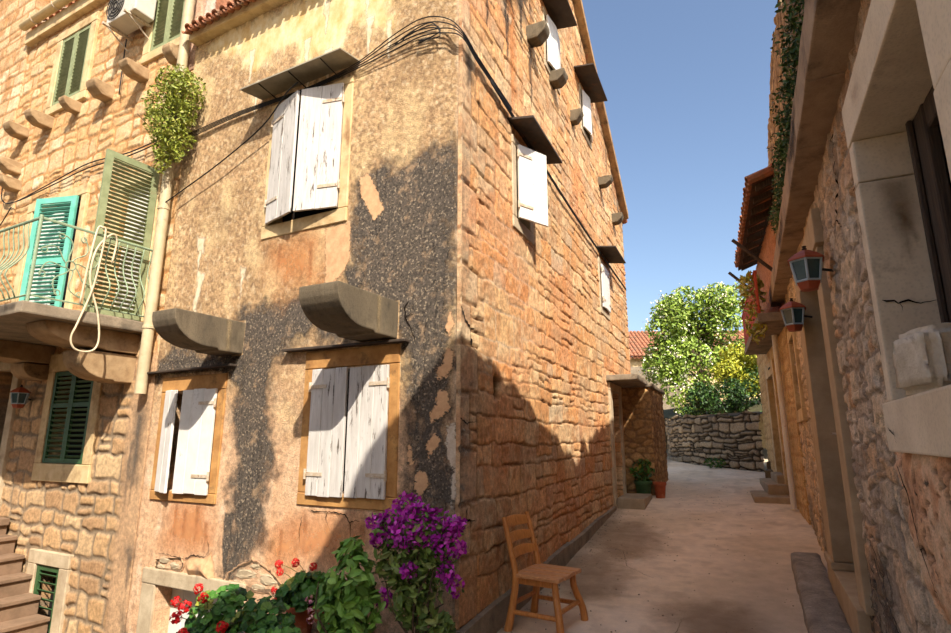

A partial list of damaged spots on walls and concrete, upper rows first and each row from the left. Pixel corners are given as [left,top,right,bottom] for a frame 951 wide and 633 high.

peeling [359,173,384,220]
water stain [192,237,205,312]
water stain [345,141,471,511]
peeling [445,311,455,336]
crack [883,299,935,310]
water stain [157,267,348,580]
peeling [425,348,456,509]
peeling [407,444,430,496]
crack [298,510,359,548]